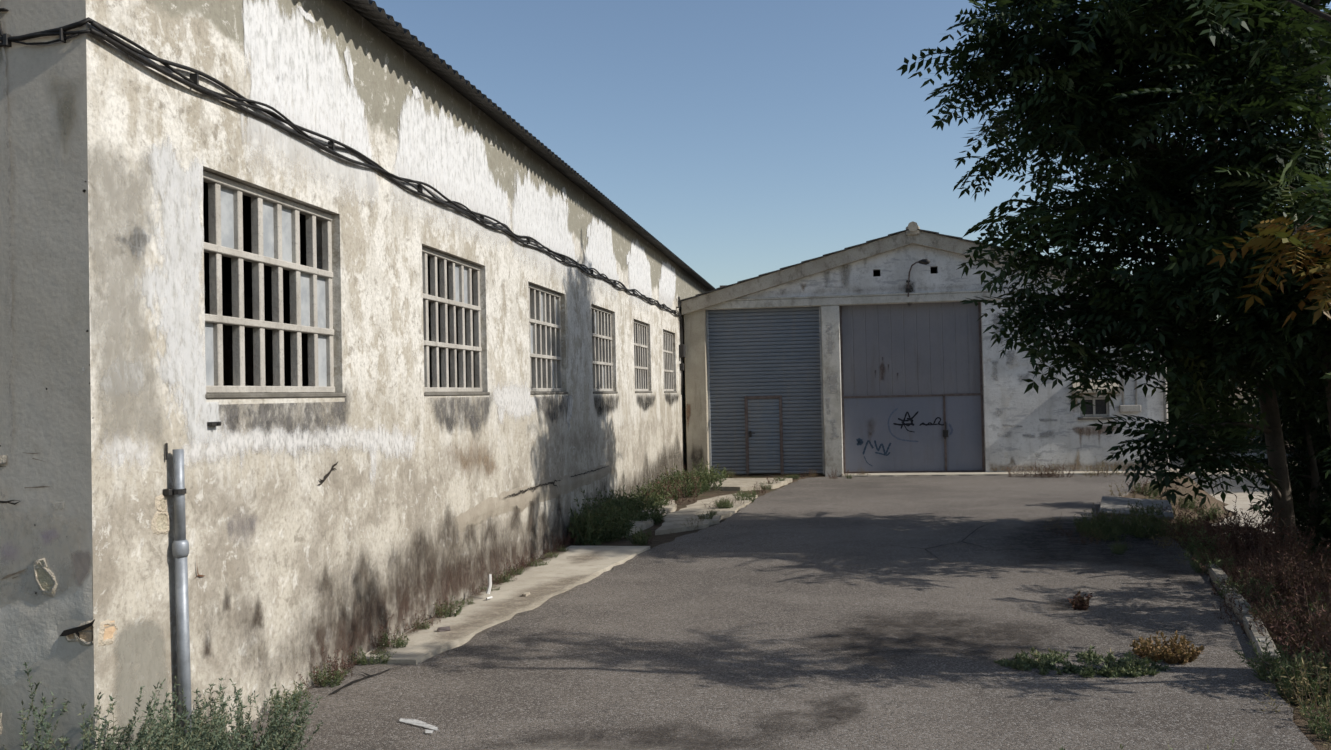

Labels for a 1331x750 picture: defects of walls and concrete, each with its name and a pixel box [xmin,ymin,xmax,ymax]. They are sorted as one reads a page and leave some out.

leakage [435,384,573,431]
leakage [594,397,618,415]
leakage [637,395,678,409]
flaking render [32,558,58,598]
leakage [310,500,594,660]
flaking render [64,619,118,647]